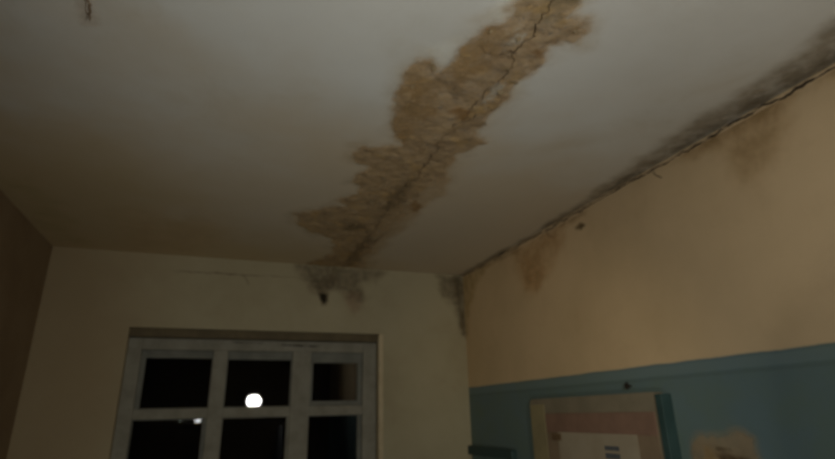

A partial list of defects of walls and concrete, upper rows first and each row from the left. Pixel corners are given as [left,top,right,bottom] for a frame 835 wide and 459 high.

crack [84,0,92,20]
damp [297,0,586,299]
crack [464,67,835,276]
peeling [692,431,758,459]